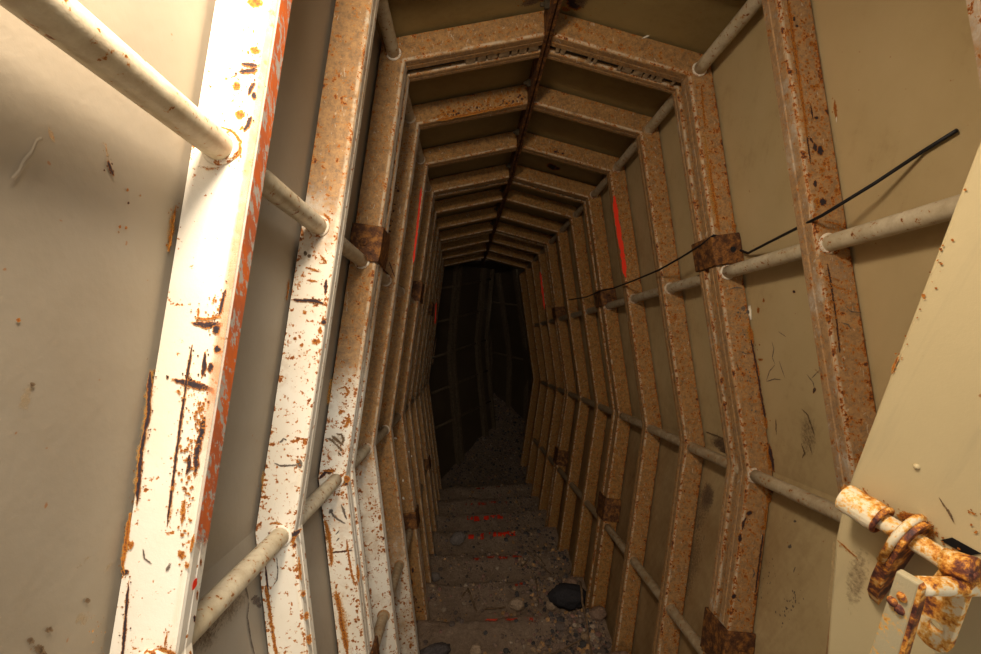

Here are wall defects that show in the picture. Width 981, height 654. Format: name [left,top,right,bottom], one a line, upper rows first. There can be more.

corrosion [220,23,260,161]
corrosion [783,0,841,226]
corrosion [166,207,181,252]
corrosion [284,251,328,359]
corrosion [327,375,353,432]
corrosion [118,280,227,654]
corrosion [318,466,351,498]
corrosion [883,500,915,522]
corrosion [264,566,278,654]
corrosion [290,529,306,597]
corrosion [324,516,362,654]
corrosion [899,582,927,654]